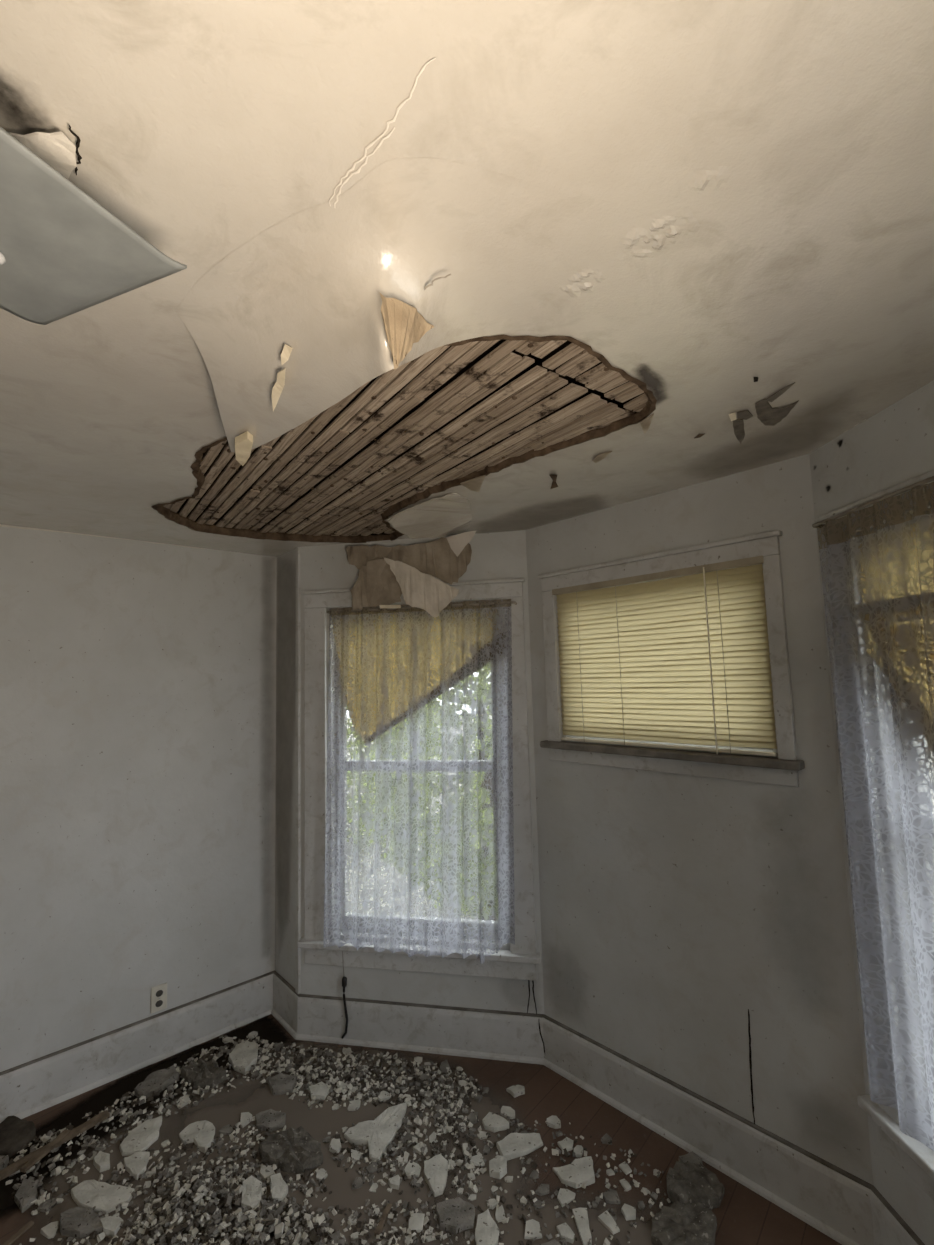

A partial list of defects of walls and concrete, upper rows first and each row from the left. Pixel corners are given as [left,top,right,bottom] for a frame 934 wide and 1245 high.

crack [329,58,436,208]
spalling [151,335,657,543]
peeling [729,382,799,444]
crack [747,1009,755,1124]